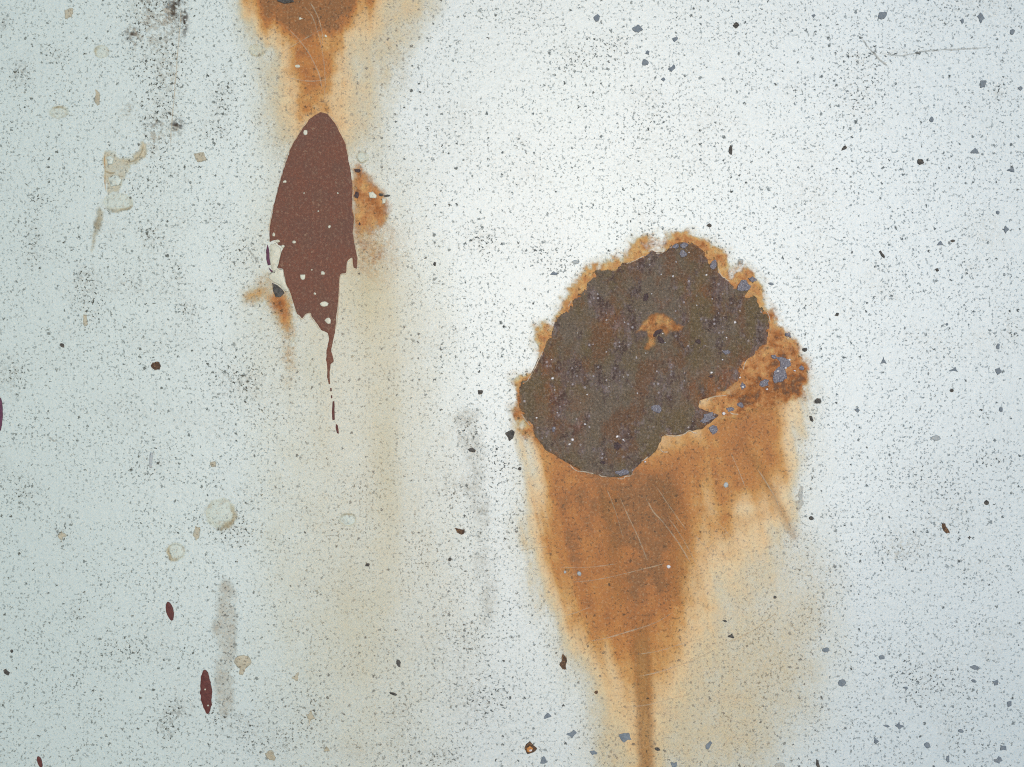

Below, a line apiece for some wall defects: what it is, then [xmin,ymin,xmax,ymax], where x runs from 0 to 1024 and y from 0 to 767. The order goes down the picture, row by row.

rust [238,0,430,149]
rust [244,280,292,332]
rust [512,231,809,767]